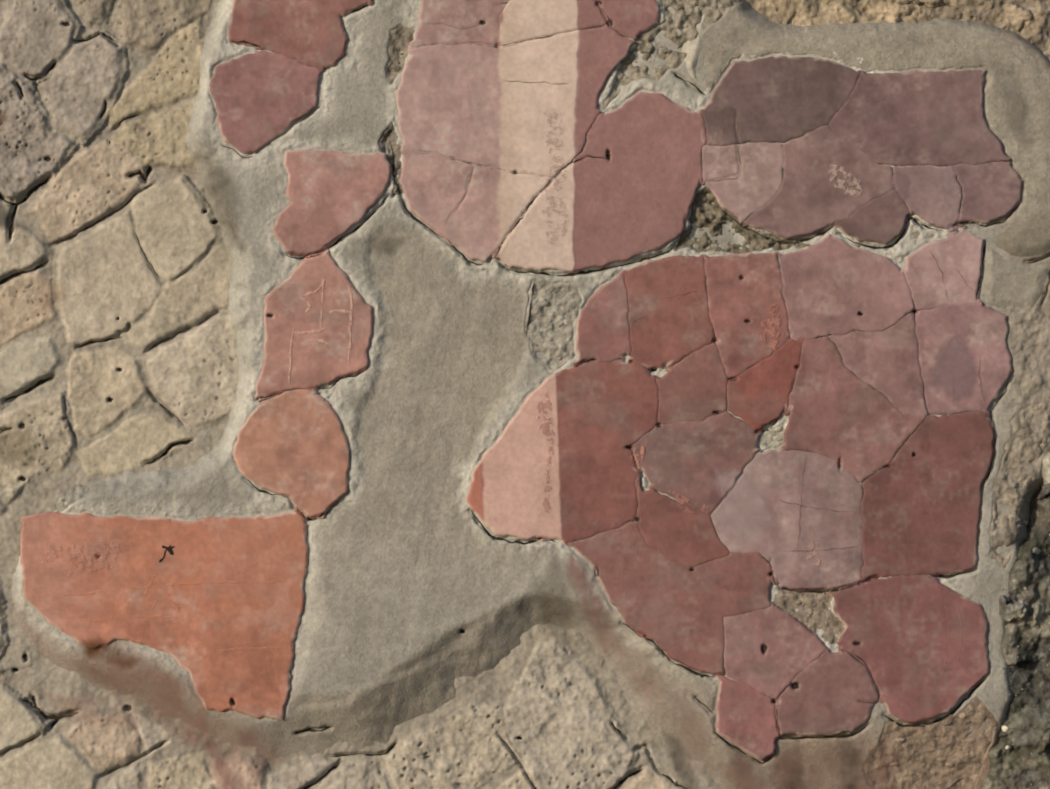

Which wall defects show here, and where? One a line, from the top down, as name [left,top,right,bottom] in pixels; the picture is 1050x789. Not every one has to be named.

spalling [602,0,746,111]
crack [284,129,684,337]
water stain [670,739,689,778]